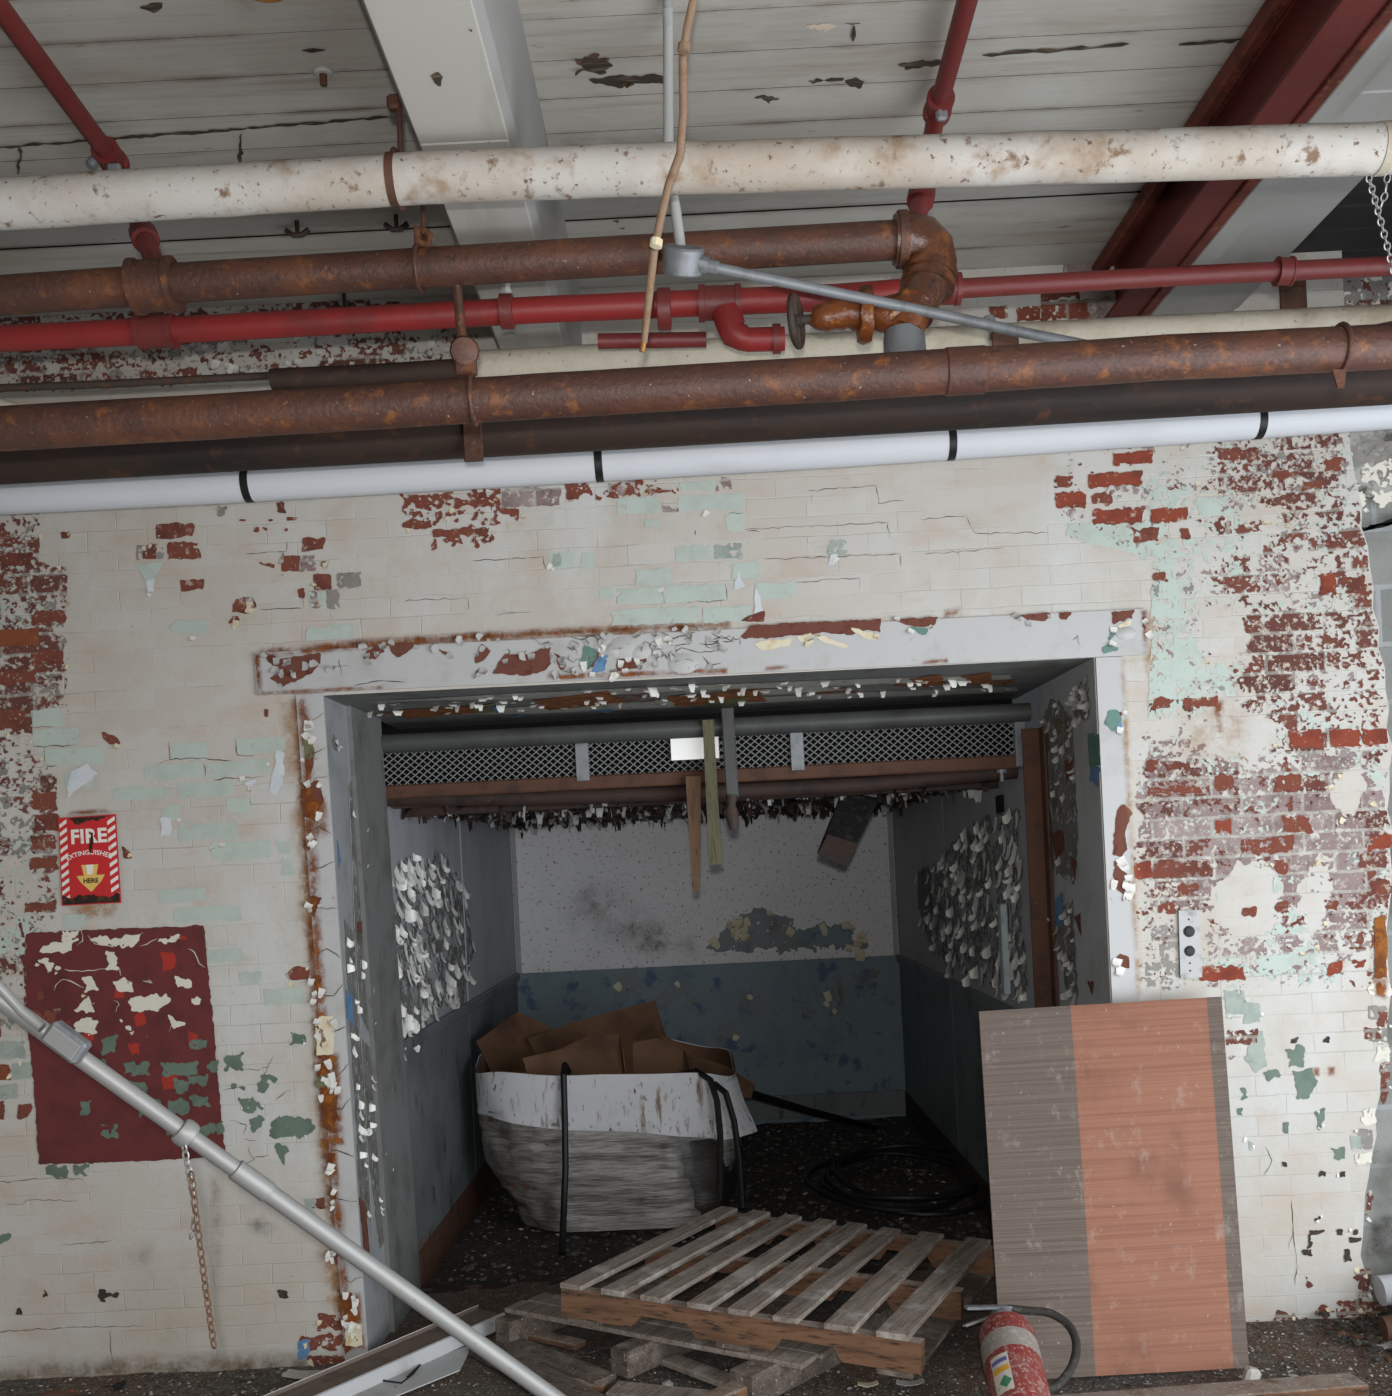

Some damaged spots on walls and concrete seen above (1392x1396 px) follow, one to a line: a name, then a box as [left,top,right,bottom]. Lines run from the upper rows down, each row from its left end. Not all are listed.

crack [0,116,389,175]
peeling [216,477,1018,719]
crack [1362,518,1392,531]
peeling [0,513,394,1253]
corrosion [283,688,353,1228]
peeling [392,851,477,1061]
peeling [1040,675,1128,1006]
peeling [1054,433,1392,1177]
peeling [98,1289,119,1302]
corrosion [331,1257,363,1348]
spalling [1272,1310,1298,1321]
spalling [1302,1190,1387,1318]